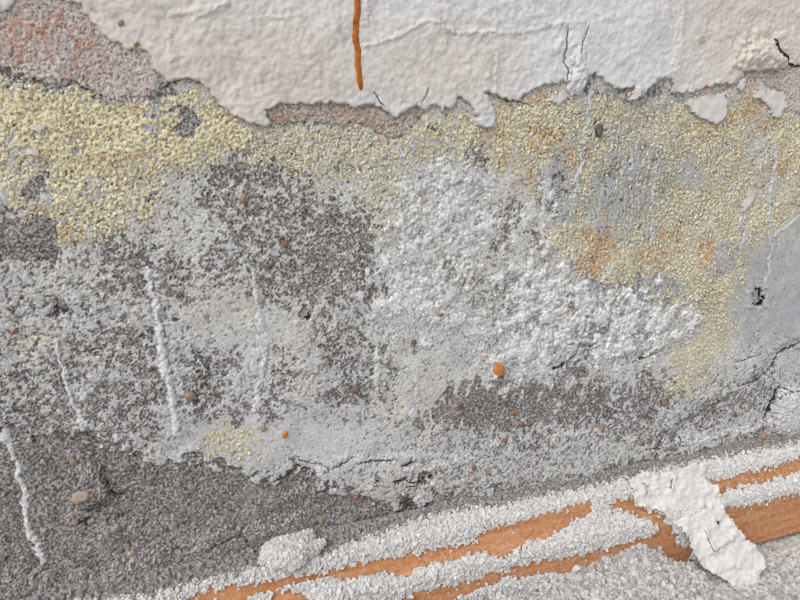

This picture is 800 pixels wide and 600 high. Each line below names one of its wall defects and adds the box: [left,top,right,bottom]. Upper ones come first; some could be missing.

rust [352,0,363,91]
crack [563,24,589,81]
crack [774,38,800,68]
spalling [0,171,66,270]
spalling [0,297,73,325]
efflorescence [144,266,184,438]
spalling [89,148,398,409]
water stain [0,67,800,427]
spalling [488,197,549,254]
crack [738,341,800,418]
efflorescence [0,420,46,565]
spalling [0,322,800,600]